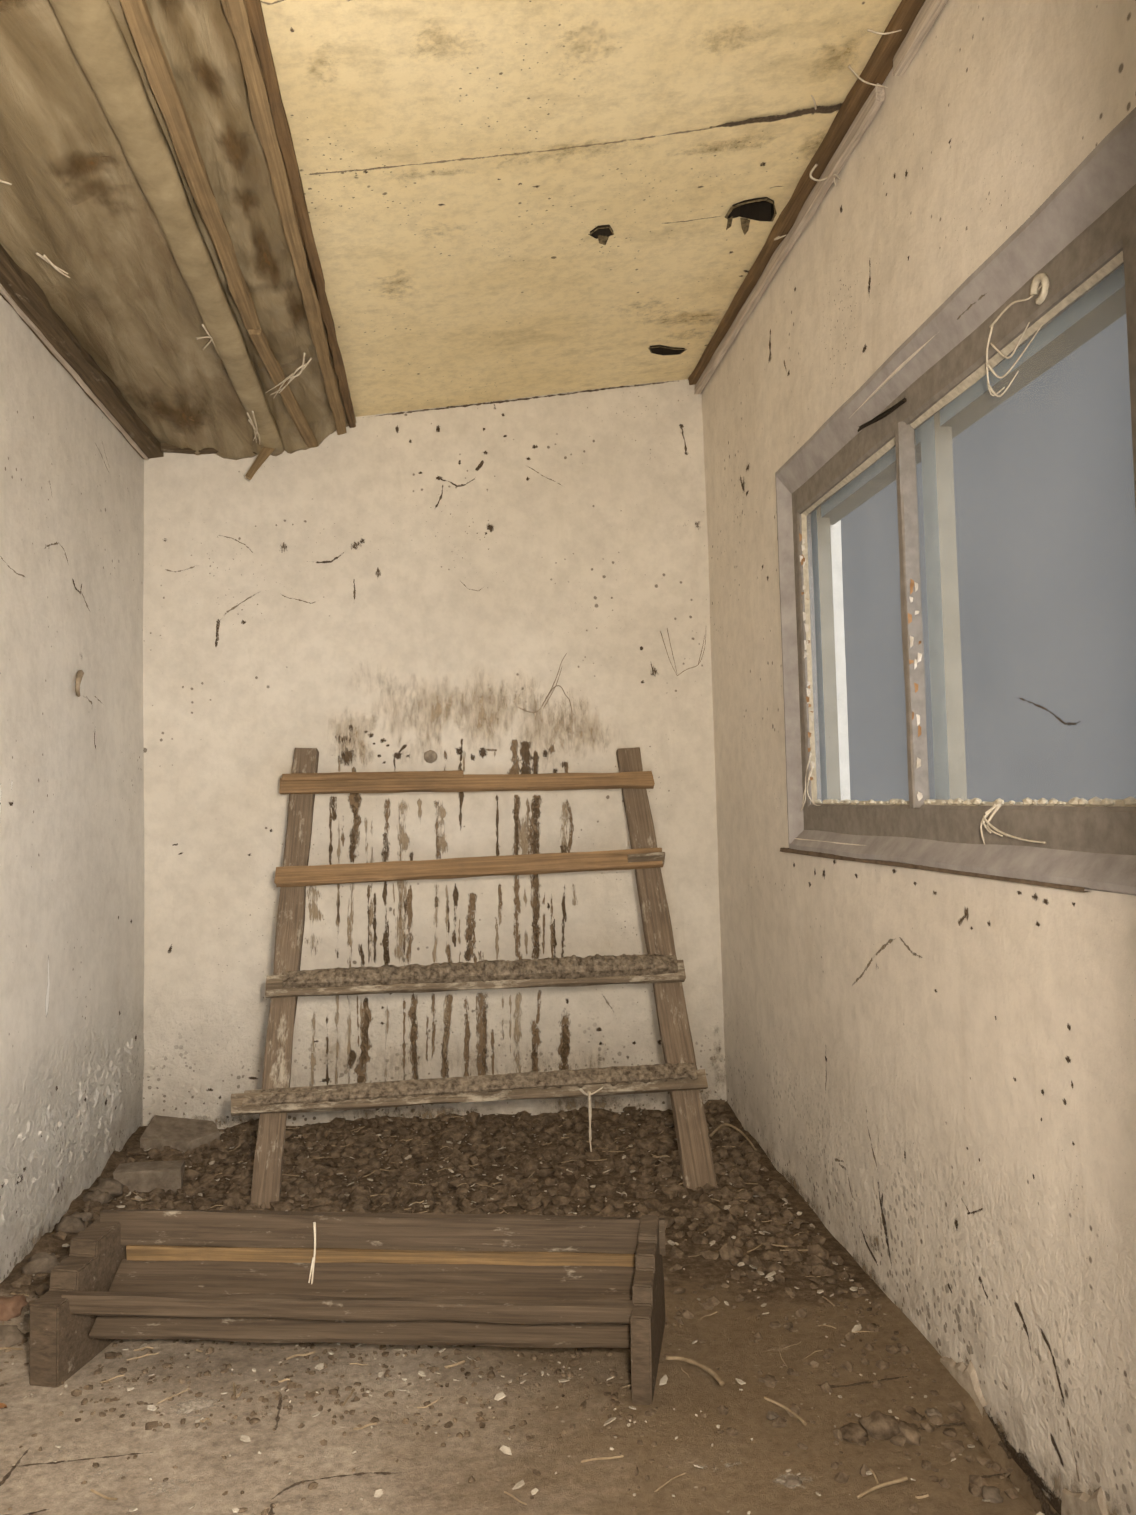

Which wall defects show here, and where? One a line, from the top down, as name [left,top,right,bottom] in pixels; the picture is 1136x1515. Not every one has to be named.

damp [198,63,220,95]
damp [57,156,111,189]
crack [309,103,843,175]
damp [335,725,410,772]
damp [425,689,568,774]
damp [329,792,464,865]
damp [496,795,541,856]
damp [560,800,574,853]
damp [307,880,413,968]
damp [432,874,576,963]
damp [311,990,541,1086]
damp [558,999,570,1070]